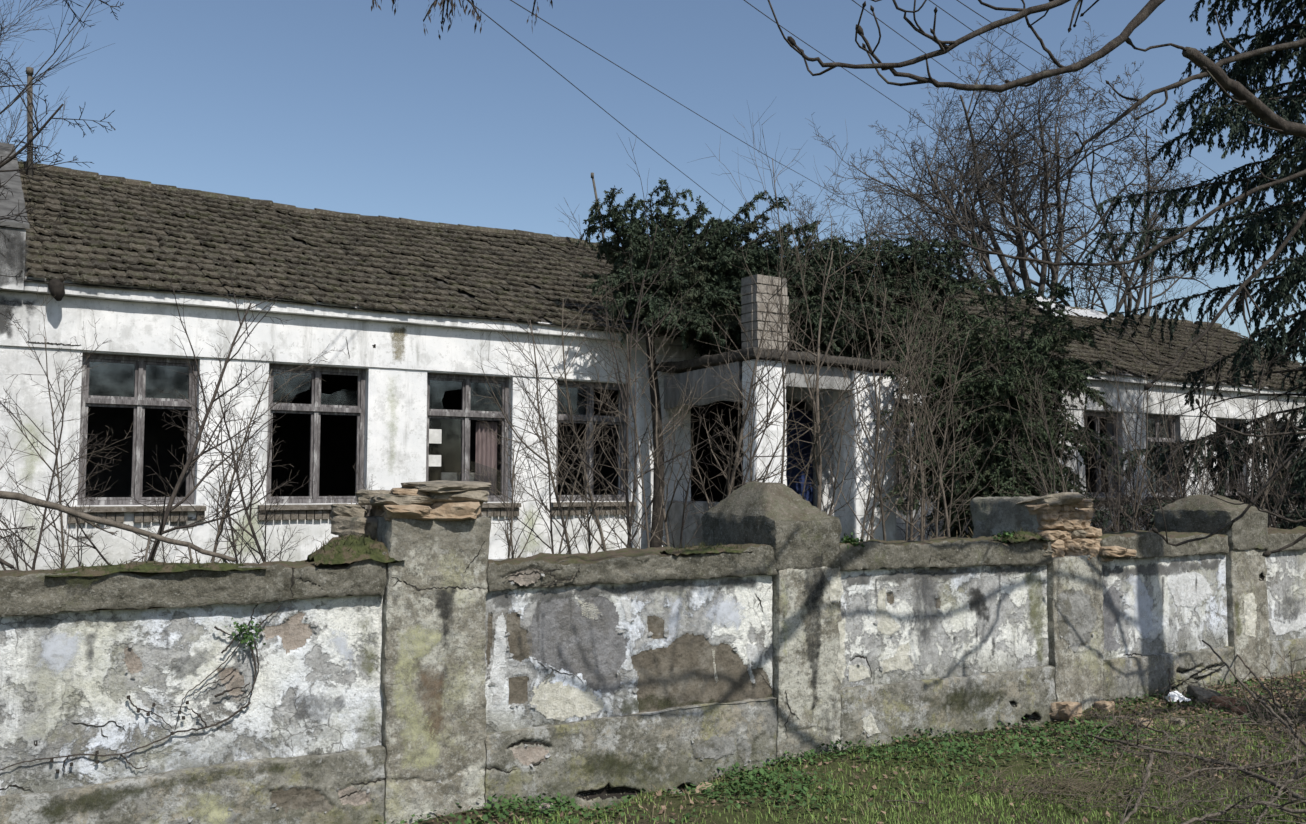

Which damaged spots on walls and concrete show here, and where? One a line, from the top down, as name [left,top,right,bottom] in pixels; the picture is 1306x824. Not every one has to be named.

water stain [392,328,405,359]
spalling [261,611,319,654]
peeling [1092,586,1124,652]
spalling [123,643,143,678]
peeling [486,596,772,713]
spalling [217,666,248,700]
spalling [270,786,375,814]